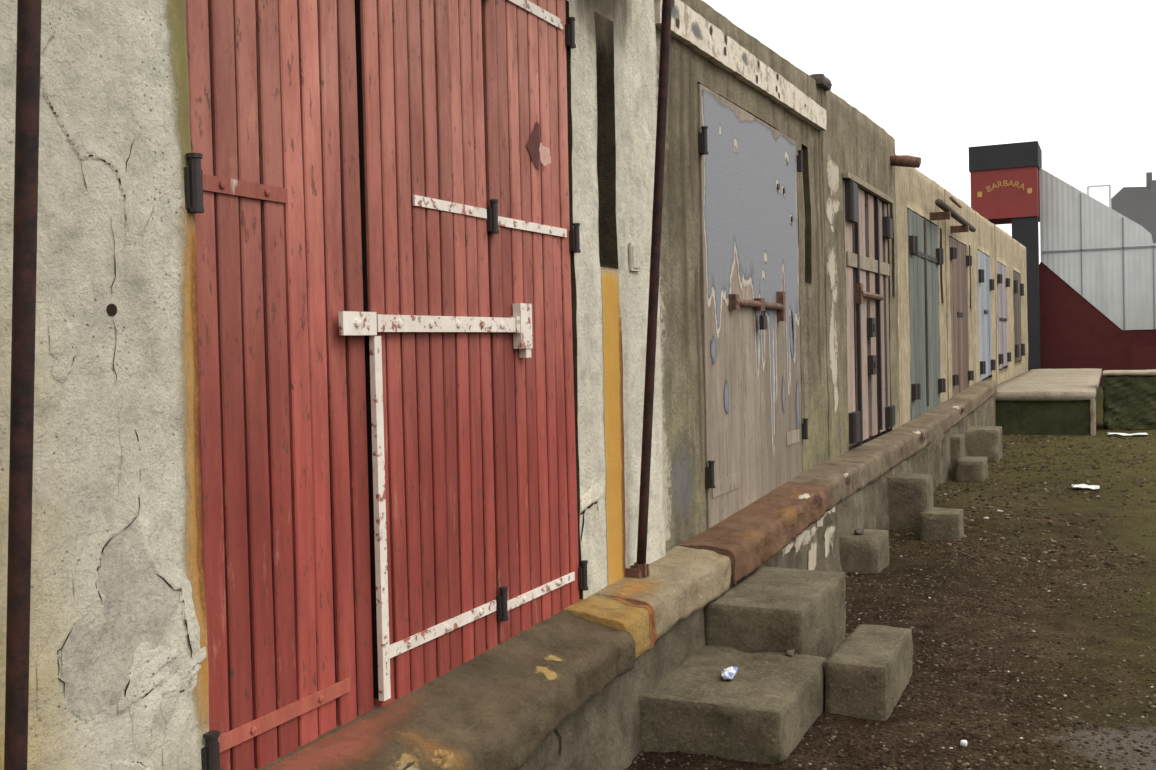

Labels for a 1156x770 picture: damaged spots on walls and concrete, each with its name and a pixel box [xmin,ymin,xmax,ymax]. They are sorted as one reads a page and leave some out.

crack [40,56,139,245]
peeling [701,90,800,455]
spalling [36,404,207,770]
rust [182,211,209,728]
spalling [783,493,835,570]
peeling [396,753,419,770]
peeling [432,749,454,768]